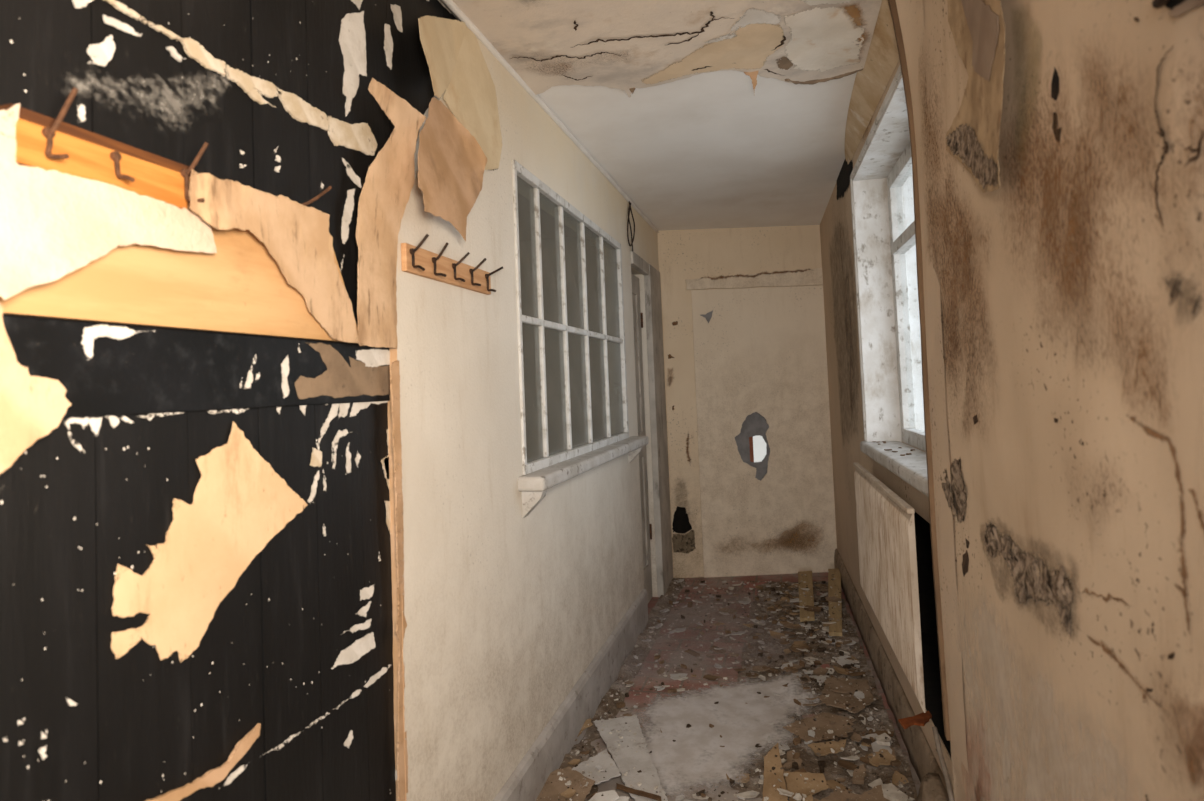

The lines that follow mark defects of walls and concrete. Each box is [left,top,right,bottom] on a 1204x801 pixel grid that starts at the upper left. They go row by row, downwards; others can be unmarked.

crack [511,11,734,80]
peeling [427,0,882,98]
peeling [72,0,377,271]
damp [923,76,988,429]
damp [1006,118,1107,297]
crack [1154,45,1203,226]
damp [1166,279,1200,314]
peeling [276,343,390,504]
crack [1130,417,1204,630]
peeling [146,664,392,801]
peeling [331,585,376,669]
crack [1089,637,1158,705]